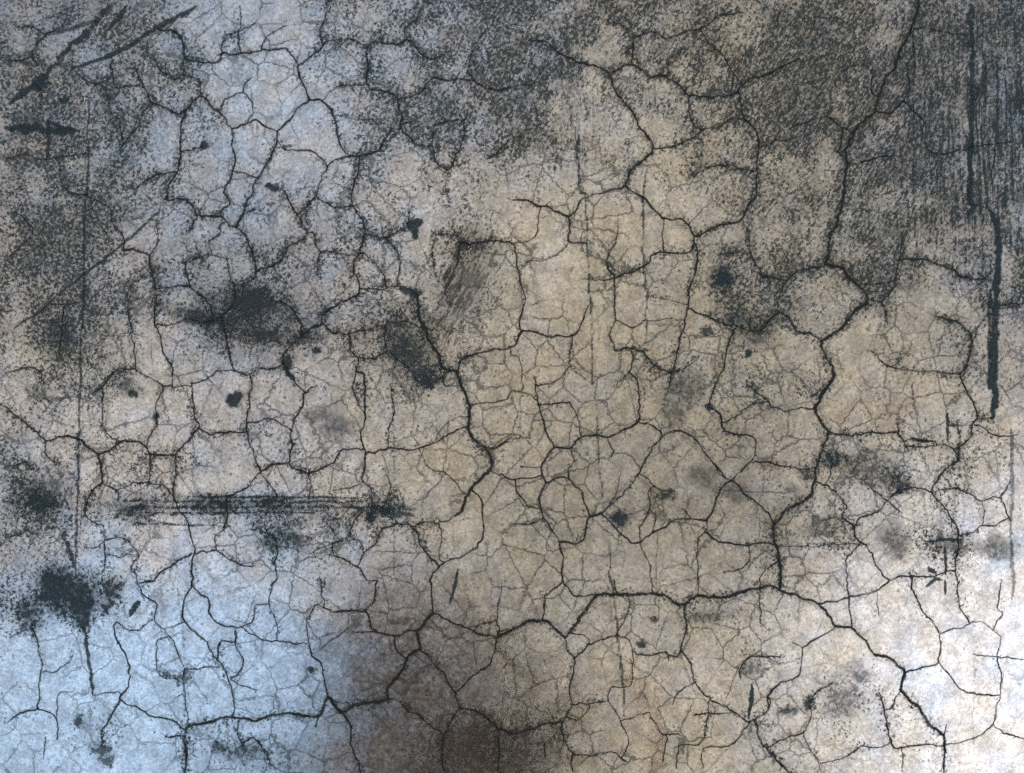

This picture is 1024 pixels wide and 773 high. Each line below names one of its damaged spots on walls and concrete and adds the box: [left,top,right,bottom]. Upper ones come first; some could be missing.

crack [7,212,57,259]
crack [6,10,68,102]
crack [80,64,142,150]
water stain [158,277,323,381]
crack [111,0,800,597]
crack [646,0,942,592]
crack [871,230,984,323]
crack [925,140,1011,178]
water stain [965,47,1003,419]
water stain [11,530,141,696]
crack [4,249,832,773]
crack [767,316,1024,773]